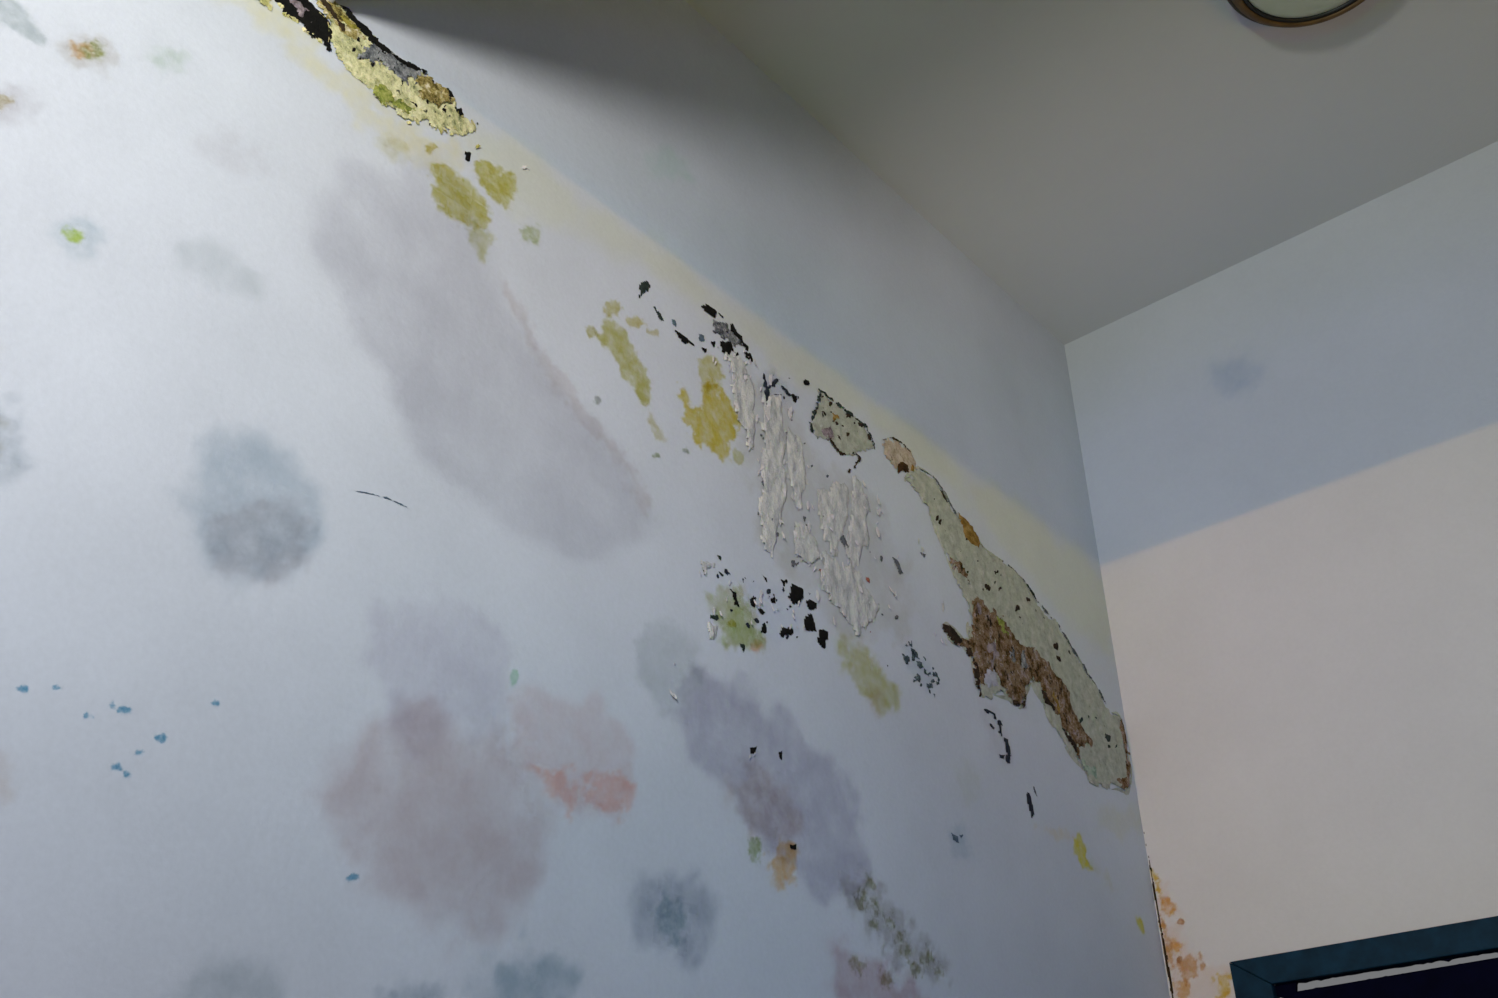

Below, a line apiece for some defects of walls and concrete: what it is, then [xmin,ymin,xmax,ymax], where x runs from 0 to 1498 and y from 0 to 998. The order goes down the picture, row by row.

spalling [260,0,480,162]
spalling [639,281,1132,795]